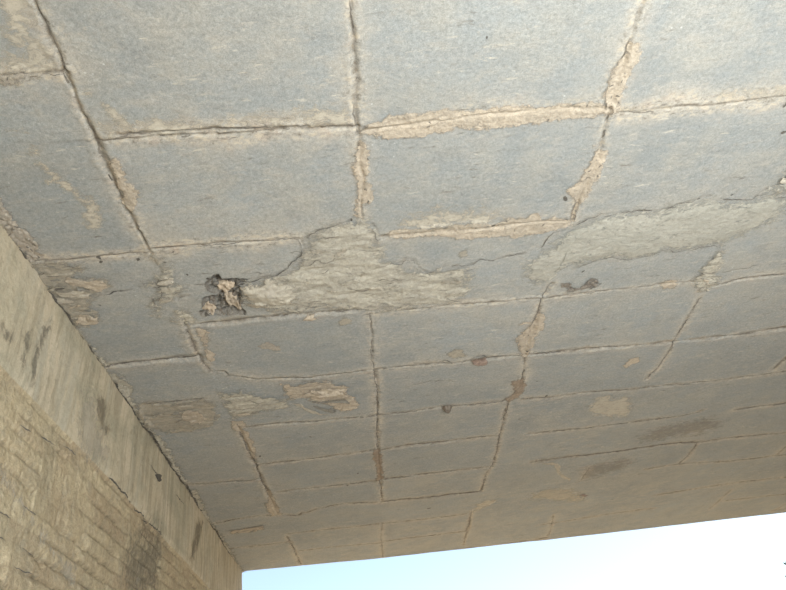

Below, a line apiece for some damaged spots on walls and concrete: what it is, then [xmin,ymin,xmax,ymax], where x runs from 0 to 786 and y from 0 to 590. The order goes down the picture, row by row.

peeling [0,198,111,327]
crack [95,280,203,304]
crack [238,222,345,284]
crack [49,292,233,558]
peeling [280,381,360,415]